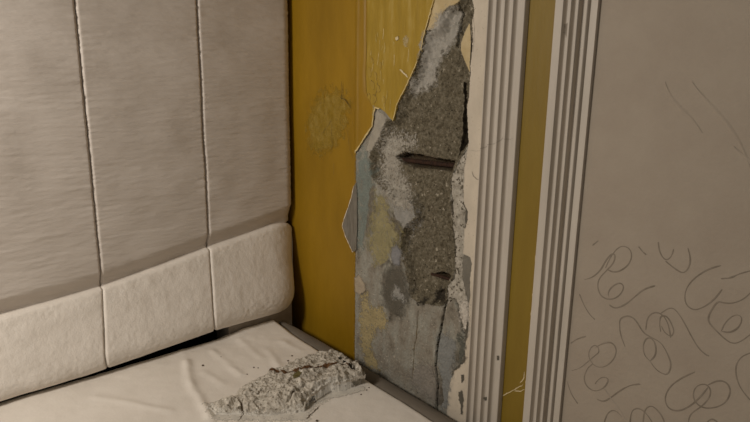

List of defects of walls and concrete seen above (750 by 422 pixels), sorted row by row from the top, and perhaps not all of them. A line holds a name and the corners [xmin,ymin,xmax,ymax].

spalling [342,0,474,416]
corrosion [398,153,455,171]
crack [412,294,448,406]